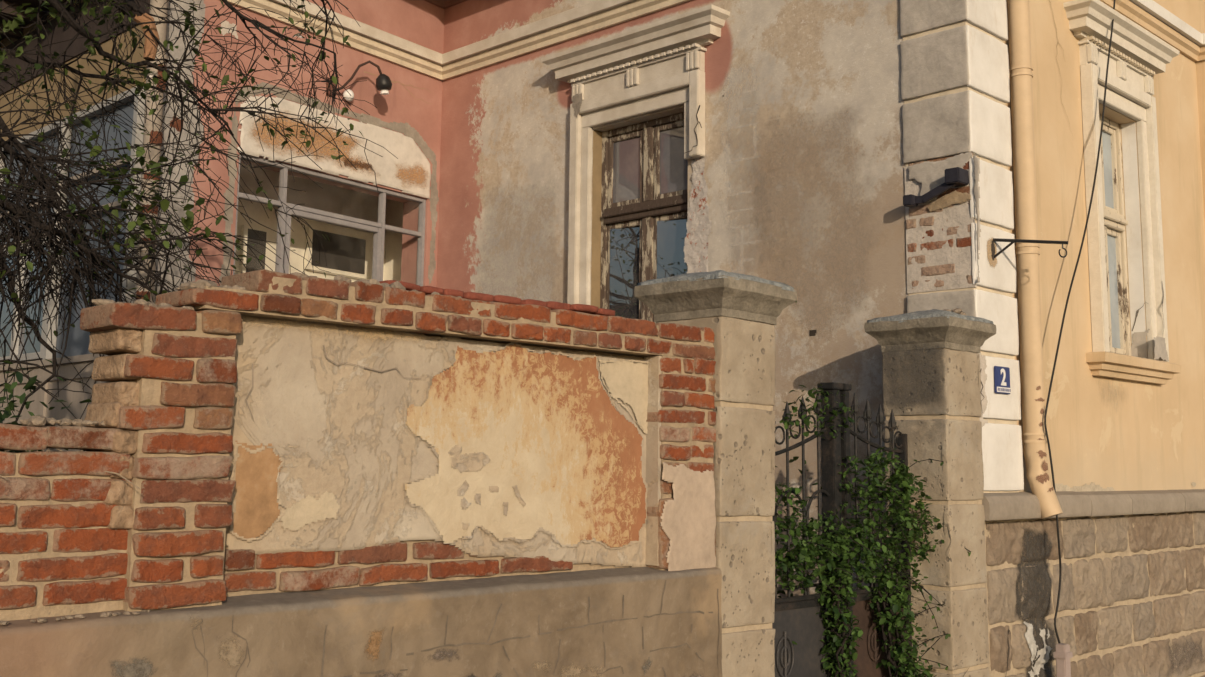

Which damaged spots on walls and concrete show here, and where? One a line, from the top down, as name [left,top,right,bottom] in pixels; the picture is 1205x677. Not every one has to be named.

crack [685,105,702,201]
flaking render [904,152,981,294]
flaking render [229,441,341,542]
flaking render [403,342,648,550]
corrosion [1035,386,1053,492]
water stain [1016,530,1056,677]